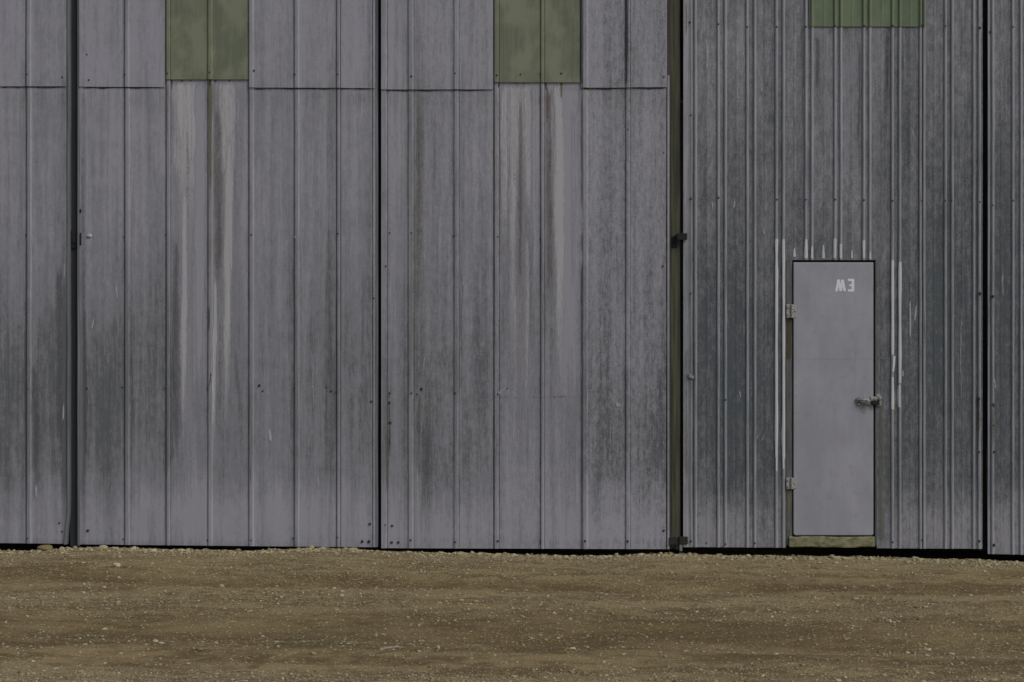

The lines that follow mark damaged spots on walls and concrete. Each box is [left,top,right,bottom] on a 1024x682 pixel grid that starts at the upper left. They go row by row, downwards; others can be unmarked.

damp [87,80,243,437]
damp [494,0,663,503]